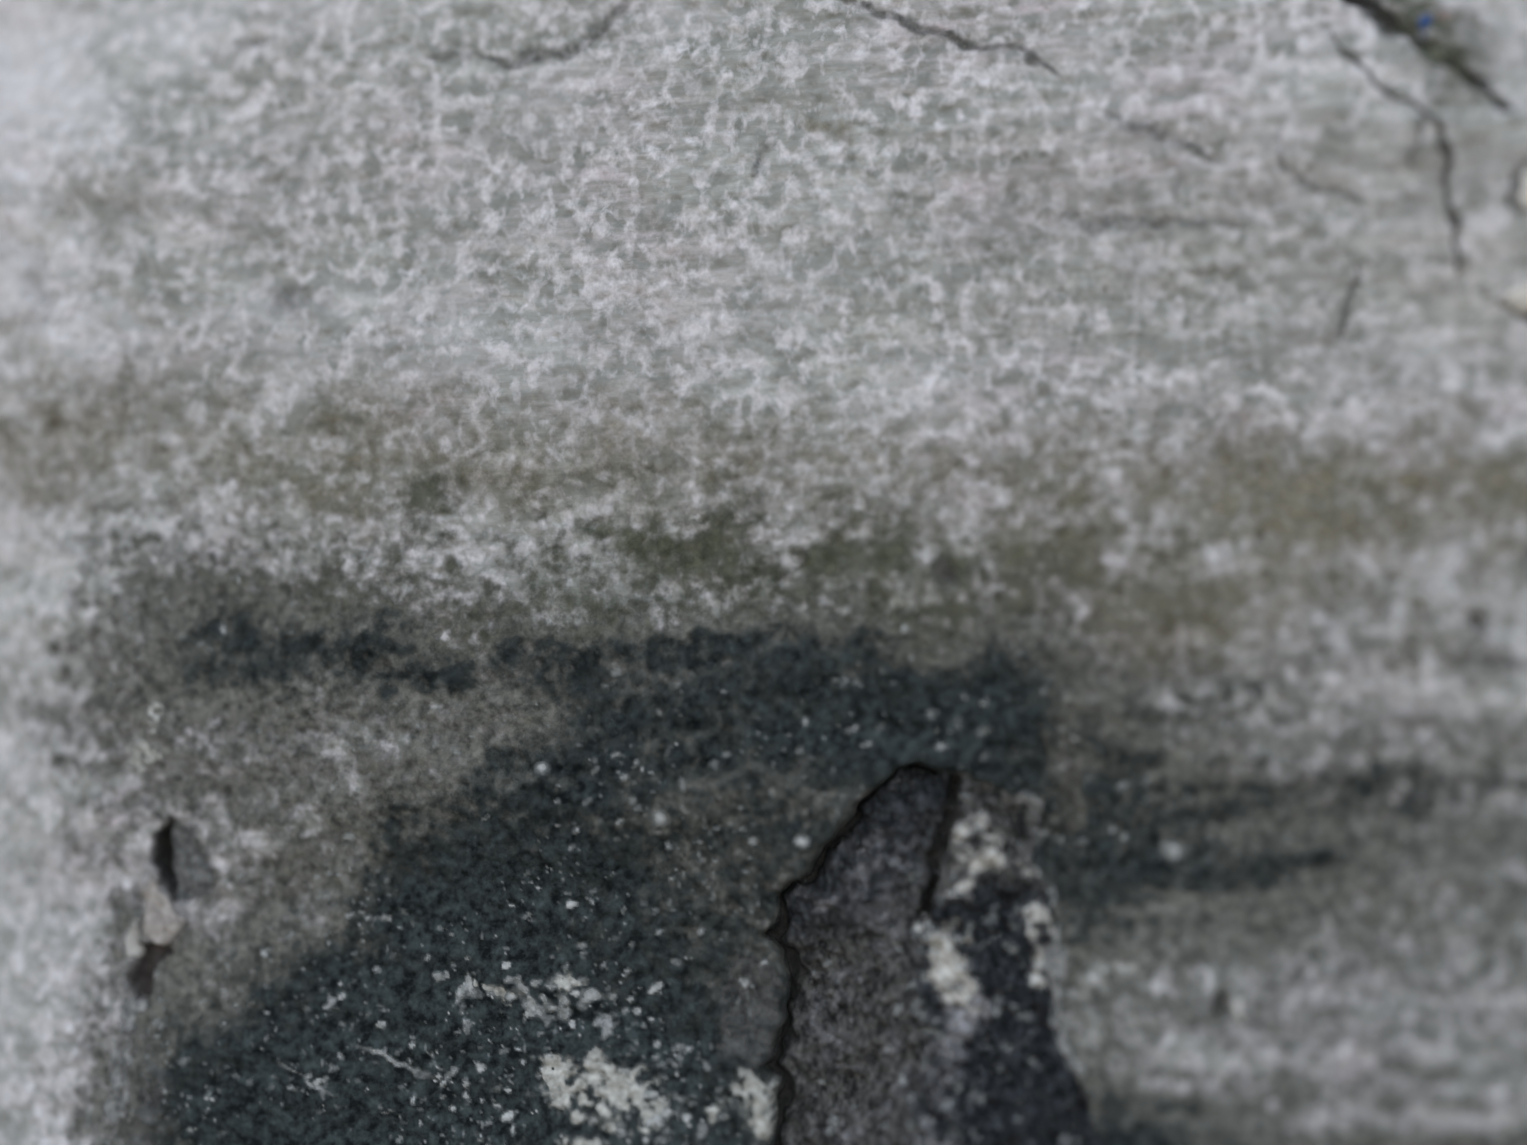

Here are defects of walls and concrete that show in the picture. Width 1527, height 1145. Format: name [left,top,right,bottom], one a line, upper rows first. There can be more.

crack [1331,0,1511,269]
crack [1500,283,1527,320]
crack [1507,168,1527,213]
crack [103,813,213,1145]
water stain [35,532,1527,1145]
spalling [719,762,1109,1145]